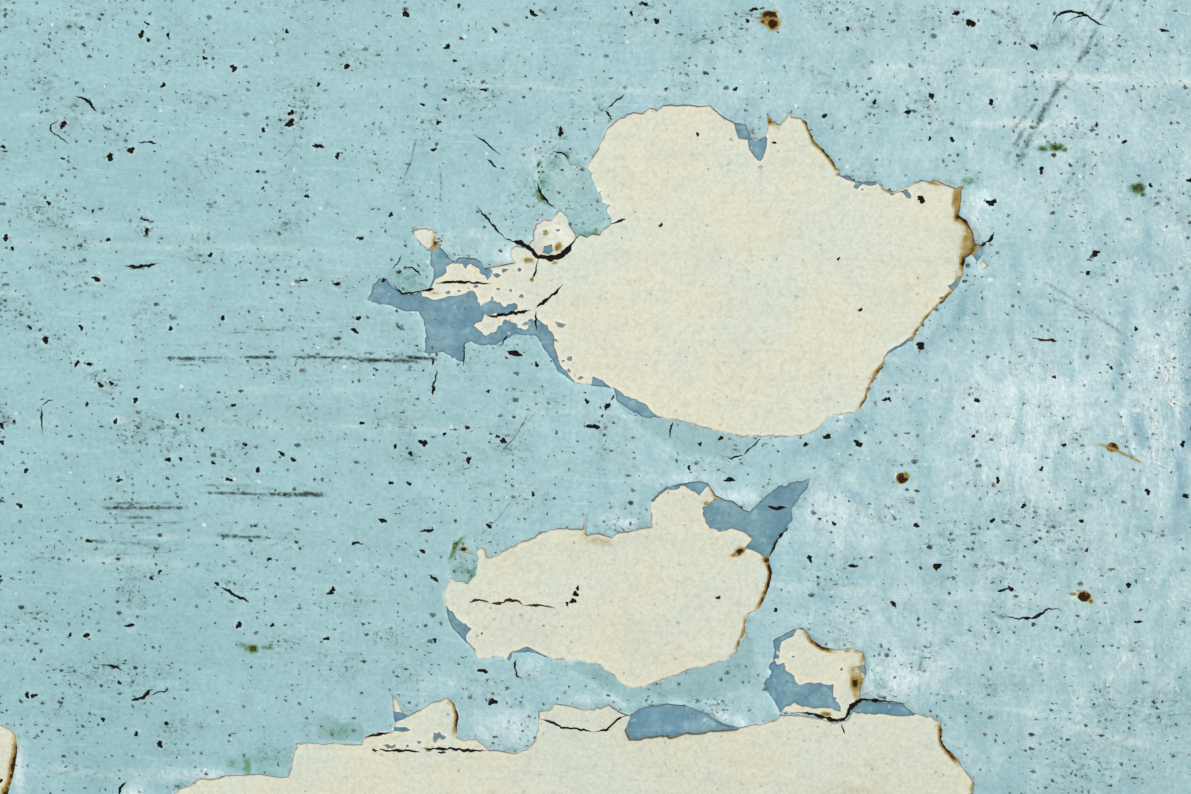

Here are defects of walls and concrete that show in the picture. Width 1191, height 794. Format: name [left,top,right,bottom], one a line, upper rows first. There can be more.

corrosion [760,10,781,31]
corrosion [802,119,839,173]
crack [394,255,490,295]
crack [478,208,577,345]
peeling [368,105,989,437]
corrosion [912,187,978,338]
corrosion [859,363,883,408]
peeling [444,479,810,688]
corrosion [756,556,772,609]
peeling [174,629,973,794]
crack [796,698,900,734]
peeling [0,725,17,794]